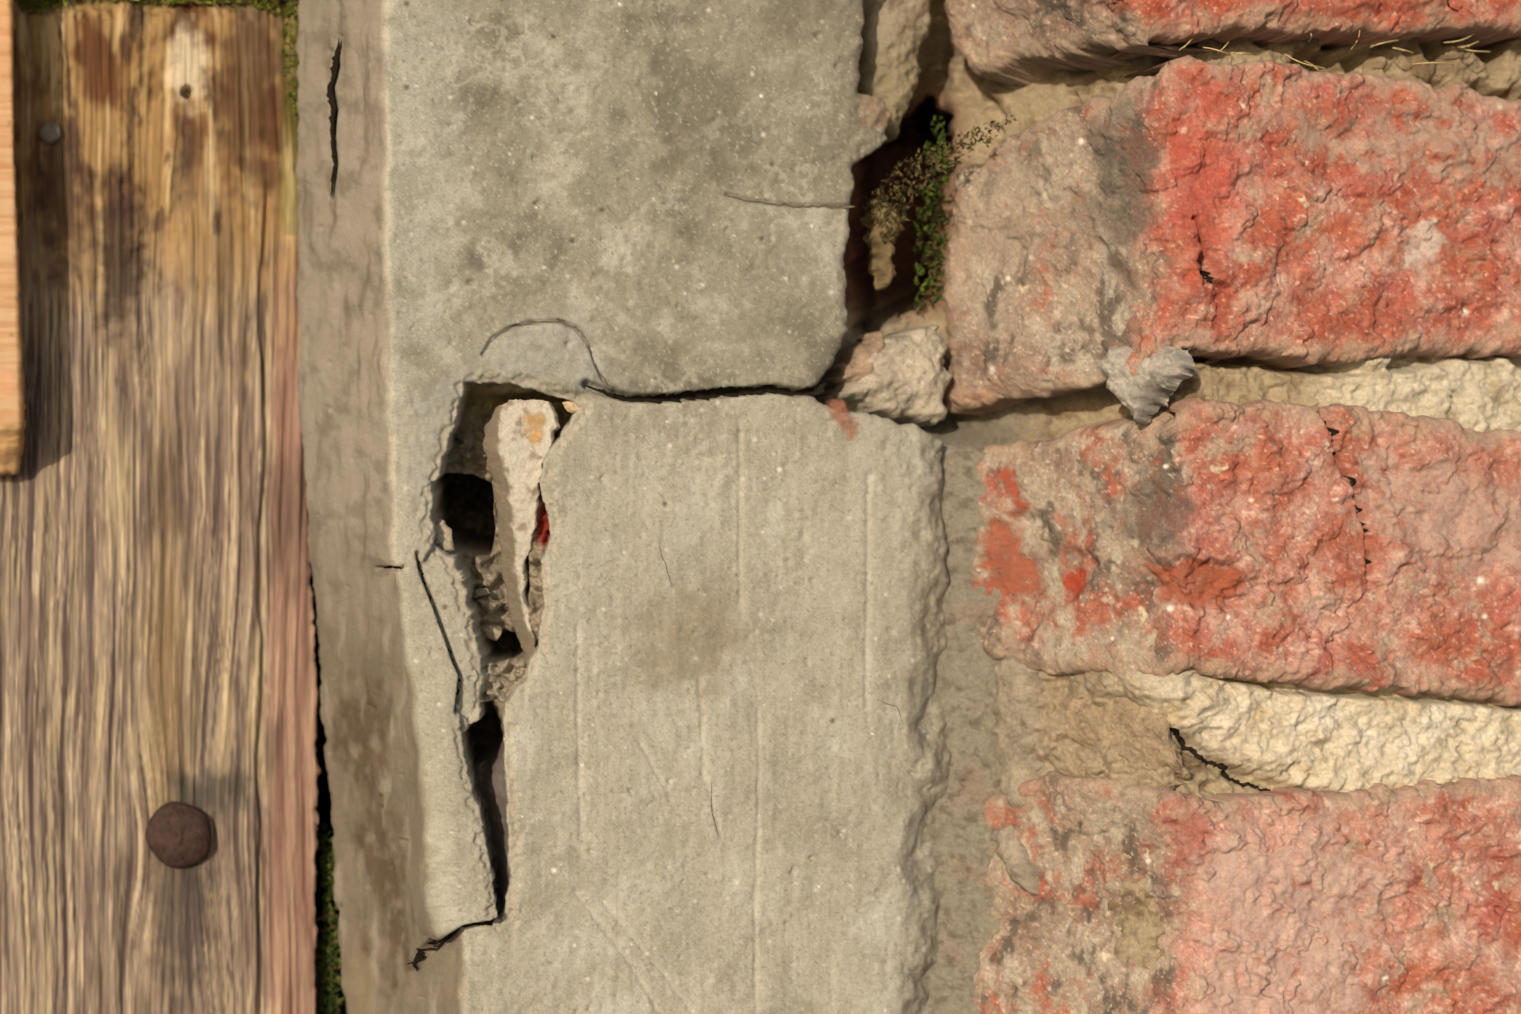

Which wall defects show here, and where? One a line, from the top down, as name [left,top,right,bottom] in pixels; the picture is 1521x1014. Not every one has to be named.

crack [326,39,340,196]
crack [727,195,855,209]
crack [483,319,826,403]
crack [1319,413,1372,565]
spalling [435,519,455,551]
spalling [473,399,579,696]
crack [1170,727,1271,791]